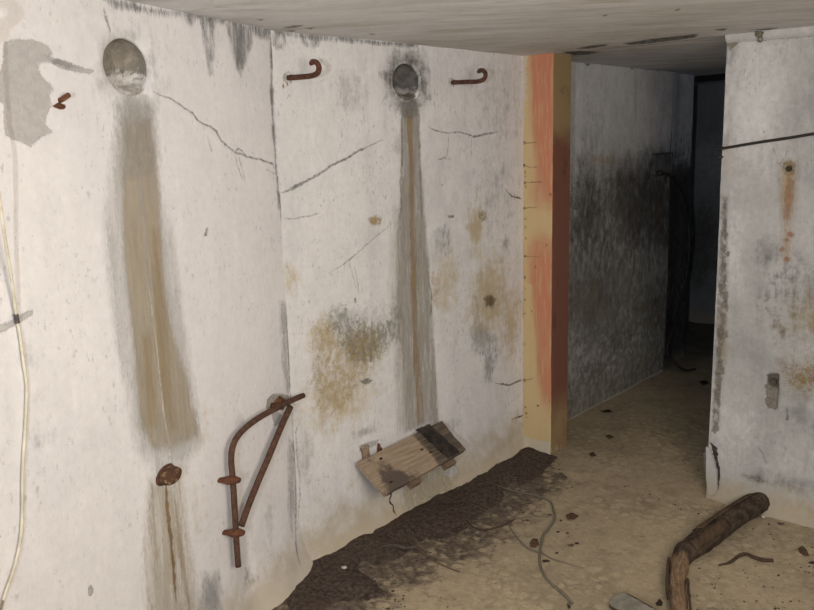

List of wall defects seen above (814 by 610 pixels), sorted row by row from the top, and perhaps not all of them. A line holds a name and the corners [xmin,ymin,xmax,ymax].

crack [160,44,375,204]
corrosion [781,161,795,221]
damp [110,105,197,465]
damp [316,101,438,429]
damp [567,152,718,417]
crack [281,308,290,388]
flaking render [765,373,779,409]
crack [289,443,297,523]
flaking render [704,446,718,496]
corrosion [150,486,191,610]